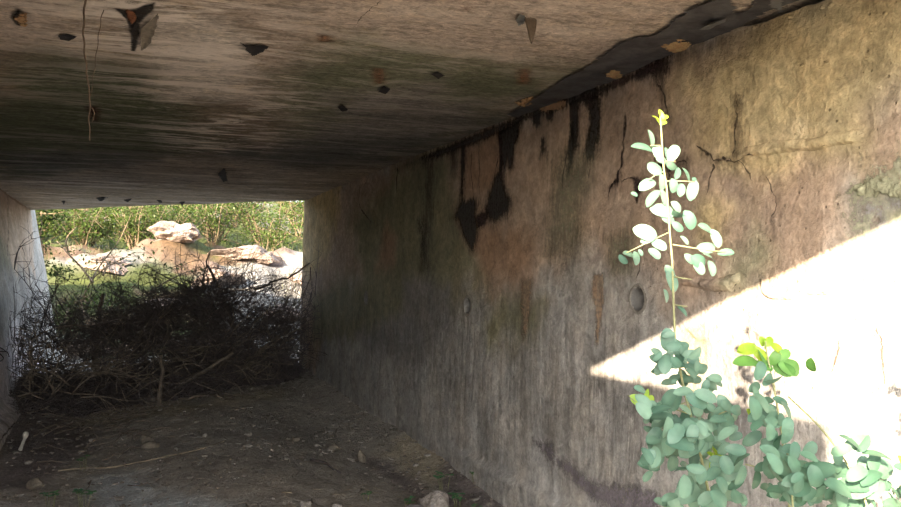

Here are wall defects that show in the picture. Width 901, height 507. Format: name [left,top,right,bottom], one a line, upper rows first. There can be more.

spalling [116,3,159,51]
spalling [605,70,623,79]
spalling [661,39,691,53]
damp [442,123,520,249]
damp [562,88,603,190]
crack [654,95,777,226]